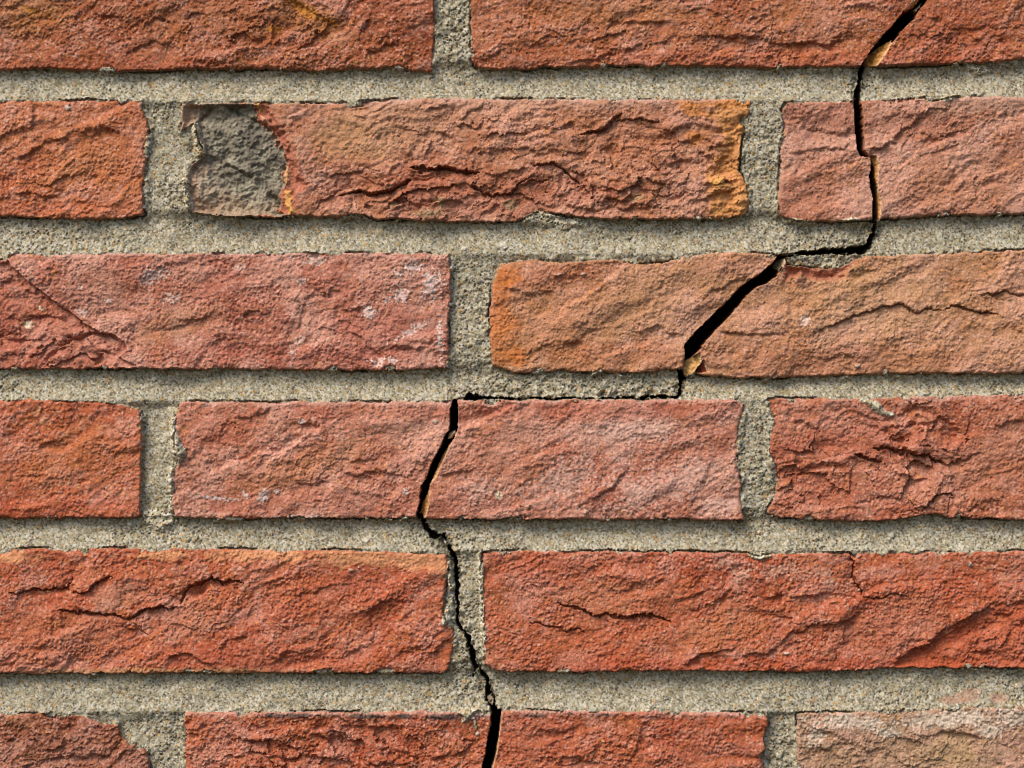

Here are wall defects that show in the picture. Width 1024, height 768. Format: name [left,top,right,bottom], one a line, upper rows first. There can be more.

spalling [181,102,311,220]
crack [341,161,580,198]
crack [417,0,928,768]
crack [854,446,942,464]
crack [922,493,954,512]